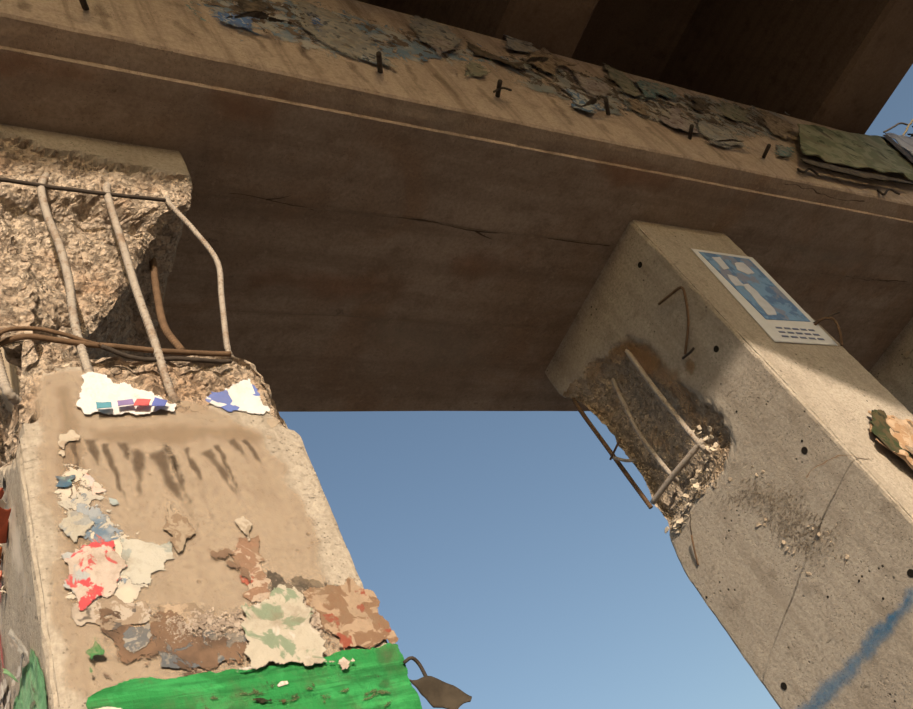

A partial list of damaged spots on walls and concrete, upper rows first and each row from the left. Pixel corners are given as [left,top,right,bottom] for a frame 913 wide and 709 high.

crack [398,217,502,239]
spalling [0,136,288,467]
leakage [72,440,121,490]
leakage [120,444,183,494]
leakage [204,446,231,479]
spalling [563,341,850,585]
peeling [0,488,11,594]